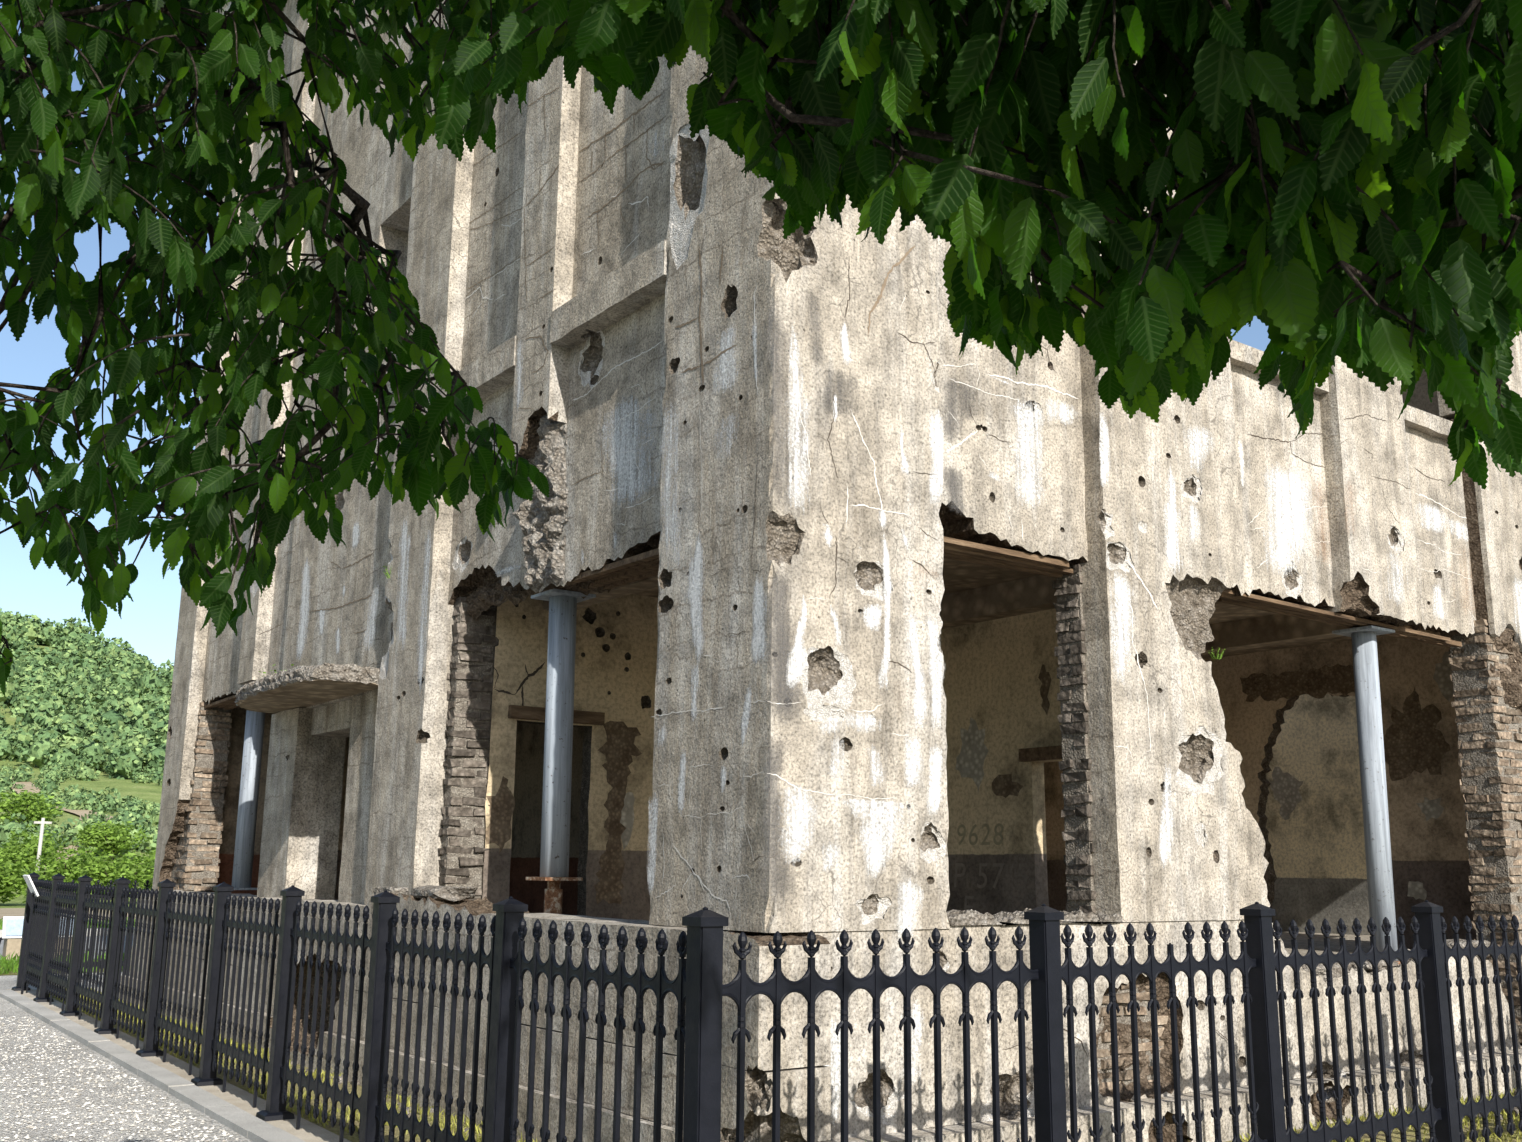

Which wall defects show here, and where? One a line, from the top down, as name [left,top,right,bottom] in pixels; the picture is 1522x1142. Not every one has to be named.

spalling [665,123,710,270]
flaking render [438,414,569,901]
spalling [800,646,856,724]
spalling [854,561,893,613]
spalling [1165,574,1229,662]
flaking render [169,702,232,891]
peeling [594,721,642,904]
spalling [1174,726,1225,798]
flaking render [1384,619,1522,1043]